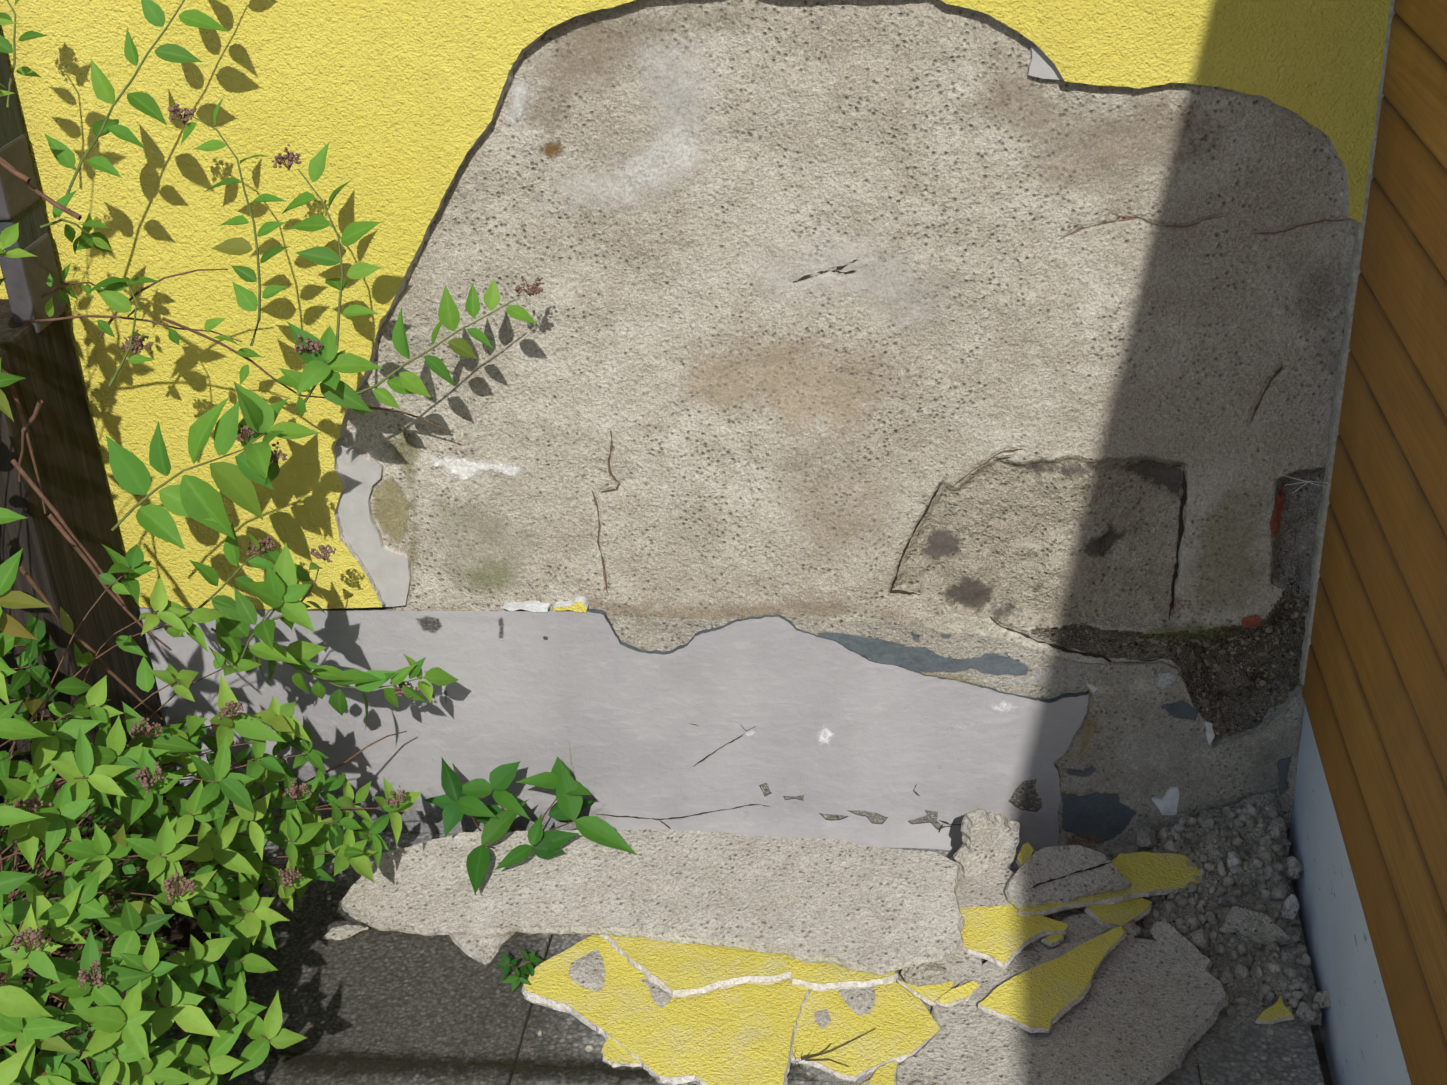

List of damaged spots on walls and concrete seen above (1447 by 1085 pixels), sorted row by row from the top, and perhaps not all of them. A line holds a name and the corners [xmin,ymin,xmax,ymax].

crack [1058,213,1224,240]
crack [1256,219,1350,235]
peeling [334,0,1360,854]
crack [592,430,620,593]
crack [890,449,1023,595]
crack [1169,471,1187,620]
crack [990,617,1163,665]